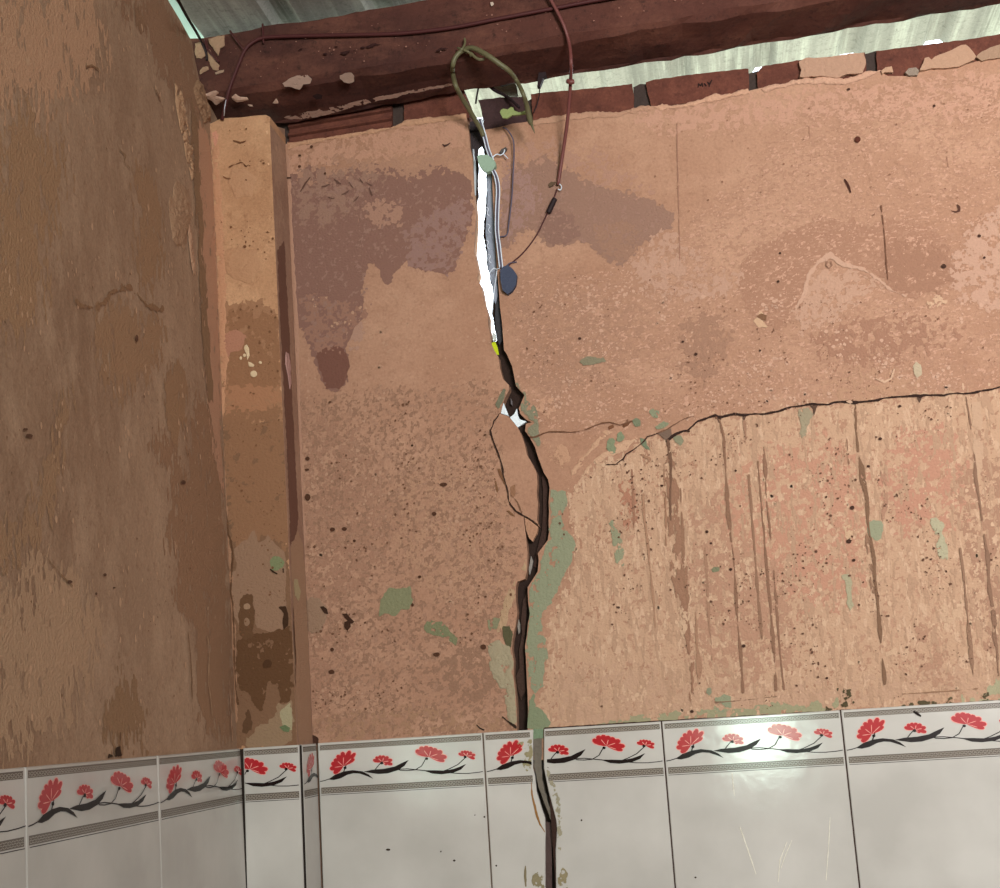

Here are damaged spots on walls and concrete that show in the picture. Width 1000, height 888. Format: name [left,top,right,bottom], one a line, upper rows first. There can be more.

spalling [283,75,312,90]
spalling [340,72,354,83]
water stain [497,132,675,267]
water stain [75,0,476,759]
water stain [508,273,660,407]
crack [476,131,1000,731]
water stain [540,215,1000,726]
flaking render [379,383,1000,731]
crack [531,760,551,832]
crack [550,857,558,888]